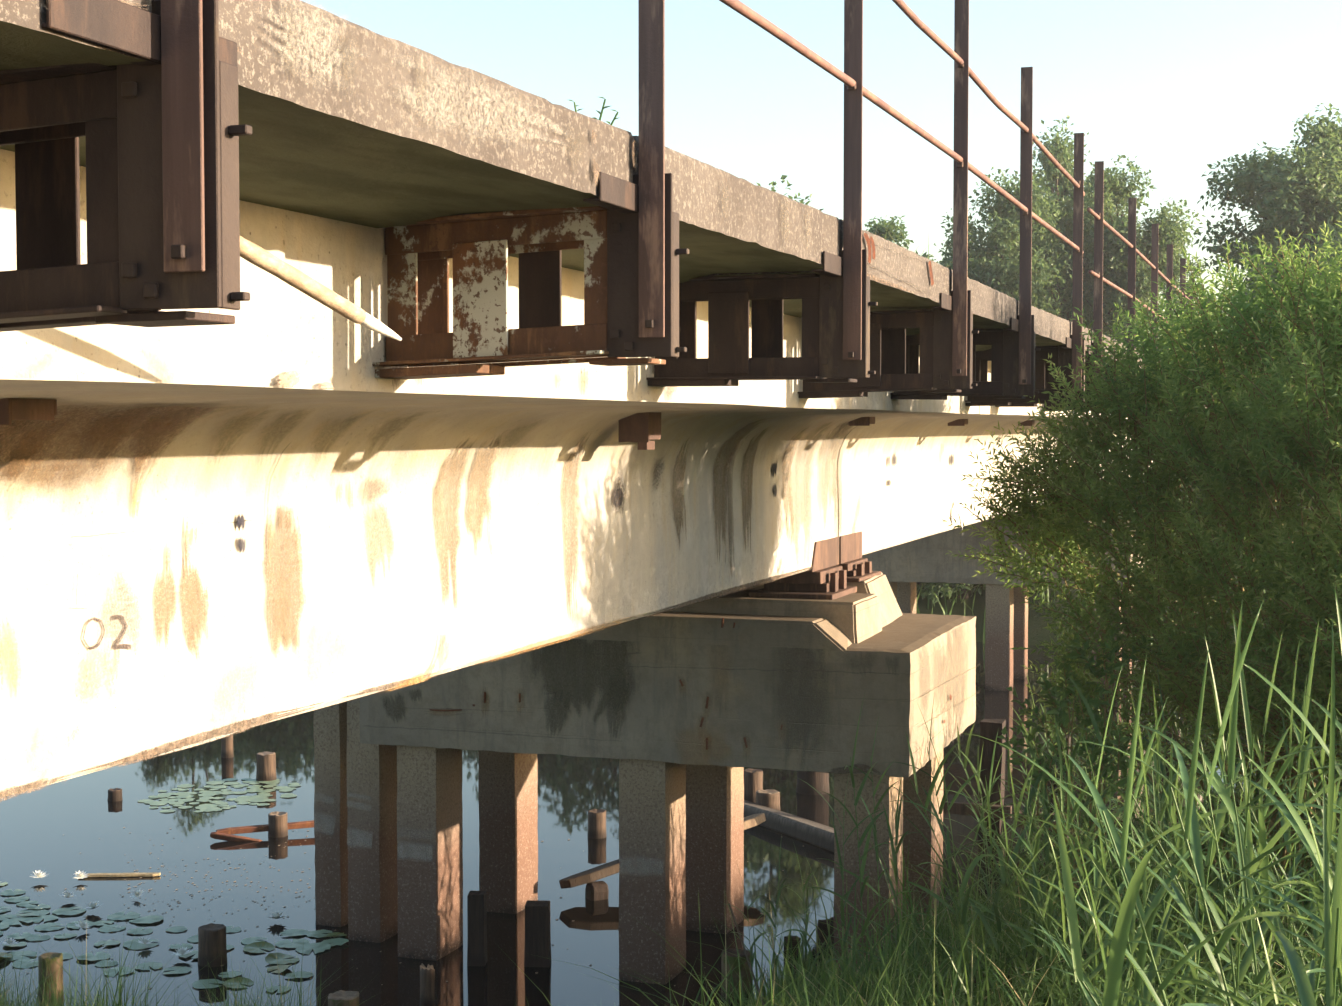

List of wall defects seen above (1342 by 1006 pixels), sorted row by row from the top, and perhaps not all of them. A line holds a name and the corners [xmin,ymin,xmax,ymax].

water stain [154,517,209,663]
water stain [265,508,306,652]
water stain [435,439,499,605]
water stain [562,439,585,614]
water stain [714,420,765,570]
water stain [783,425,850,546]
water stain [532,639,632,734]